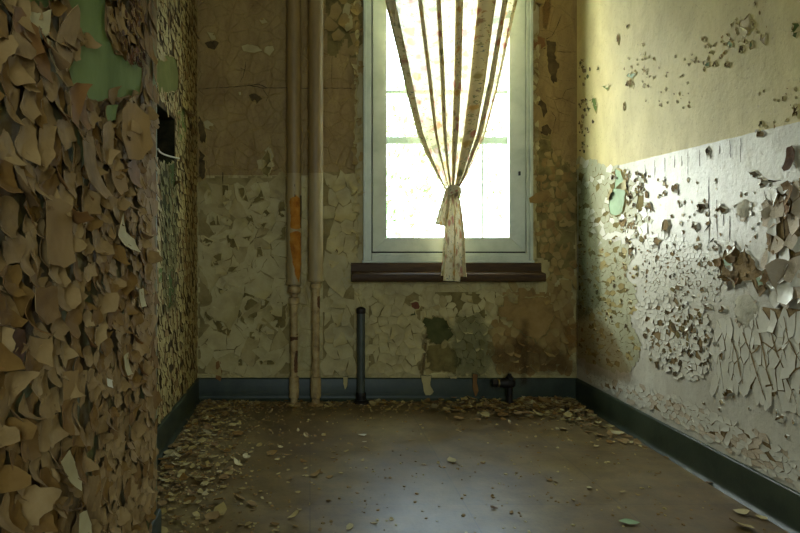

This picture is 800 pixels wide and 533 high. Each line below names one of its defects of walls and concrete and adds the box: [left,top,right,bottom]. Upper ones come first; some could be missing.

peeling [0,0,351,533]
corrosion [289,195,301,282]
peeling [317,0,800,490]
crack [639,154,800,416]